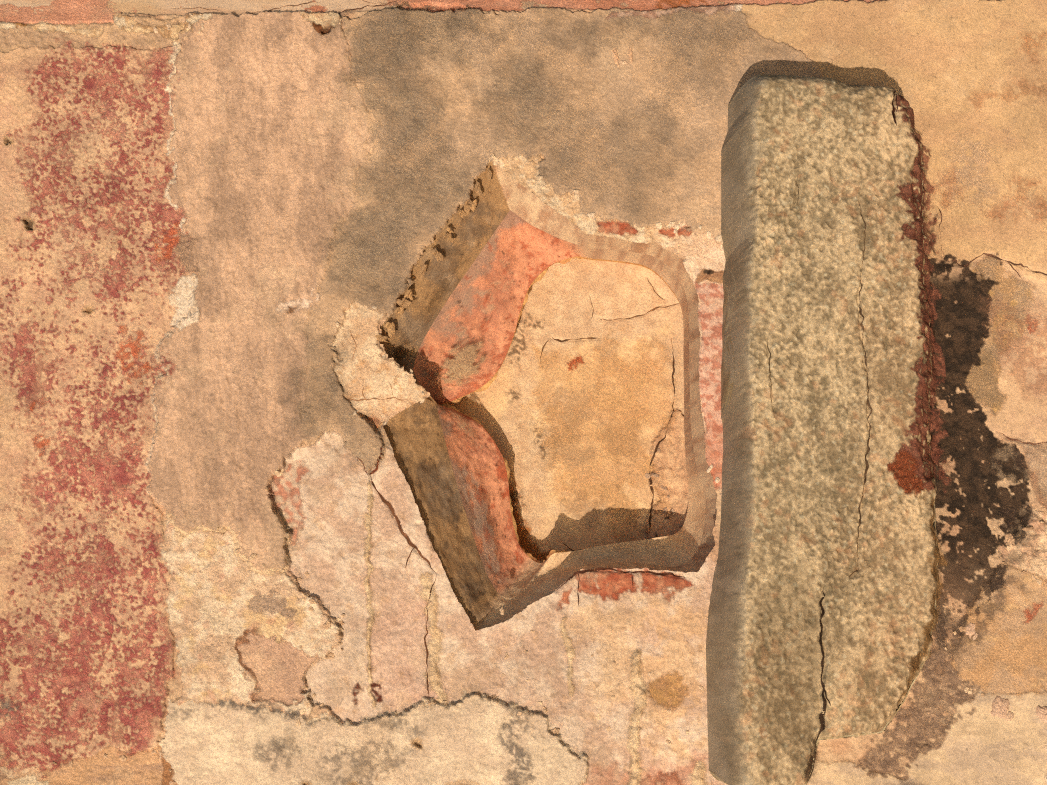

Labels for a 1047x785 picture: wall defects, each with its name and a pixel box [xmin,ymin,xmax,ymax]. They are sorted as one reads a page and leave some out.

spalling [0,0,727,785]
crack [357,446,436,699]
crack [816,591,831,741]
crack [850,206,872,576]
water stain [855,94,1032,785]
spalling [944,438,1047,697]
spalling [967,257,1031,415]